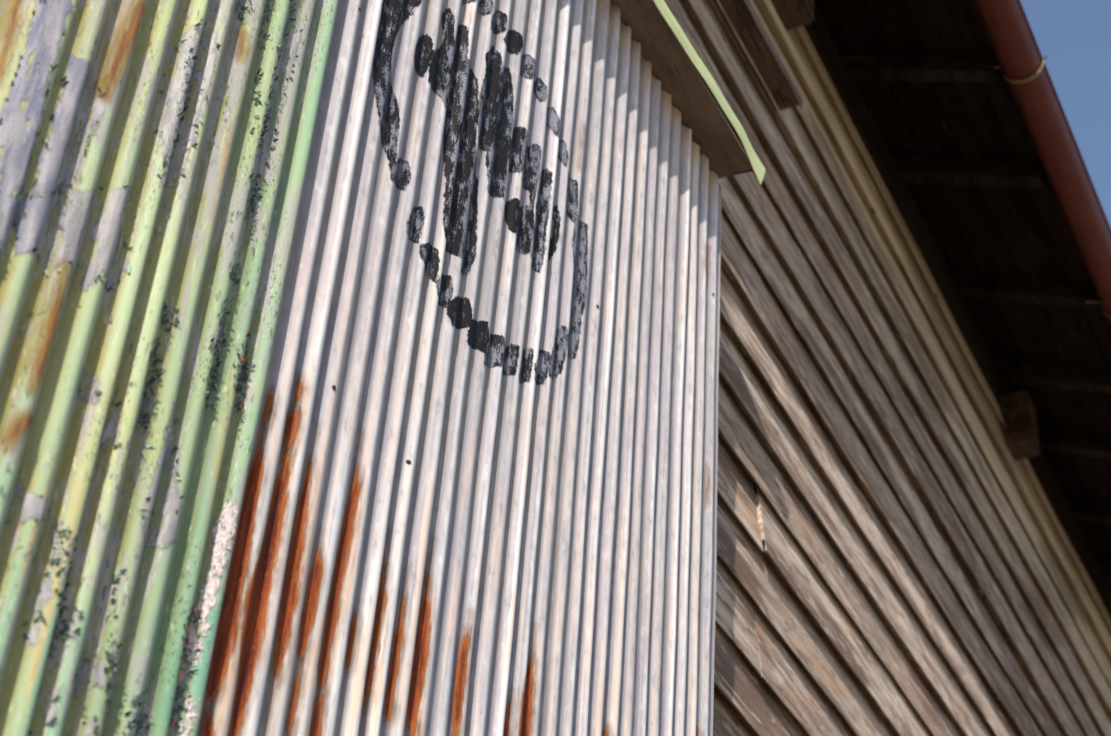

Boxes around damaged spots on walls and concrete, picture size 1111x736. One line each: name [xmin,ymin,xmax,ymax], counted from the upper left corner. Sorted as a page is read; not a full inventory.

peeling [0,0,133,292]
peeling [155,22,222,188]
peeling [235,0,304,221]
peeling [78,302,185,549]
peeling [204,299,251,412]
peeling [5,466,84,736]
peeling [74,569,151,736]
peeling [170,606,202,735]
rust [201,378,361,736]
rust [363,567,431,736]
rust [452,635,469,736]
rust [503,657,534,736]